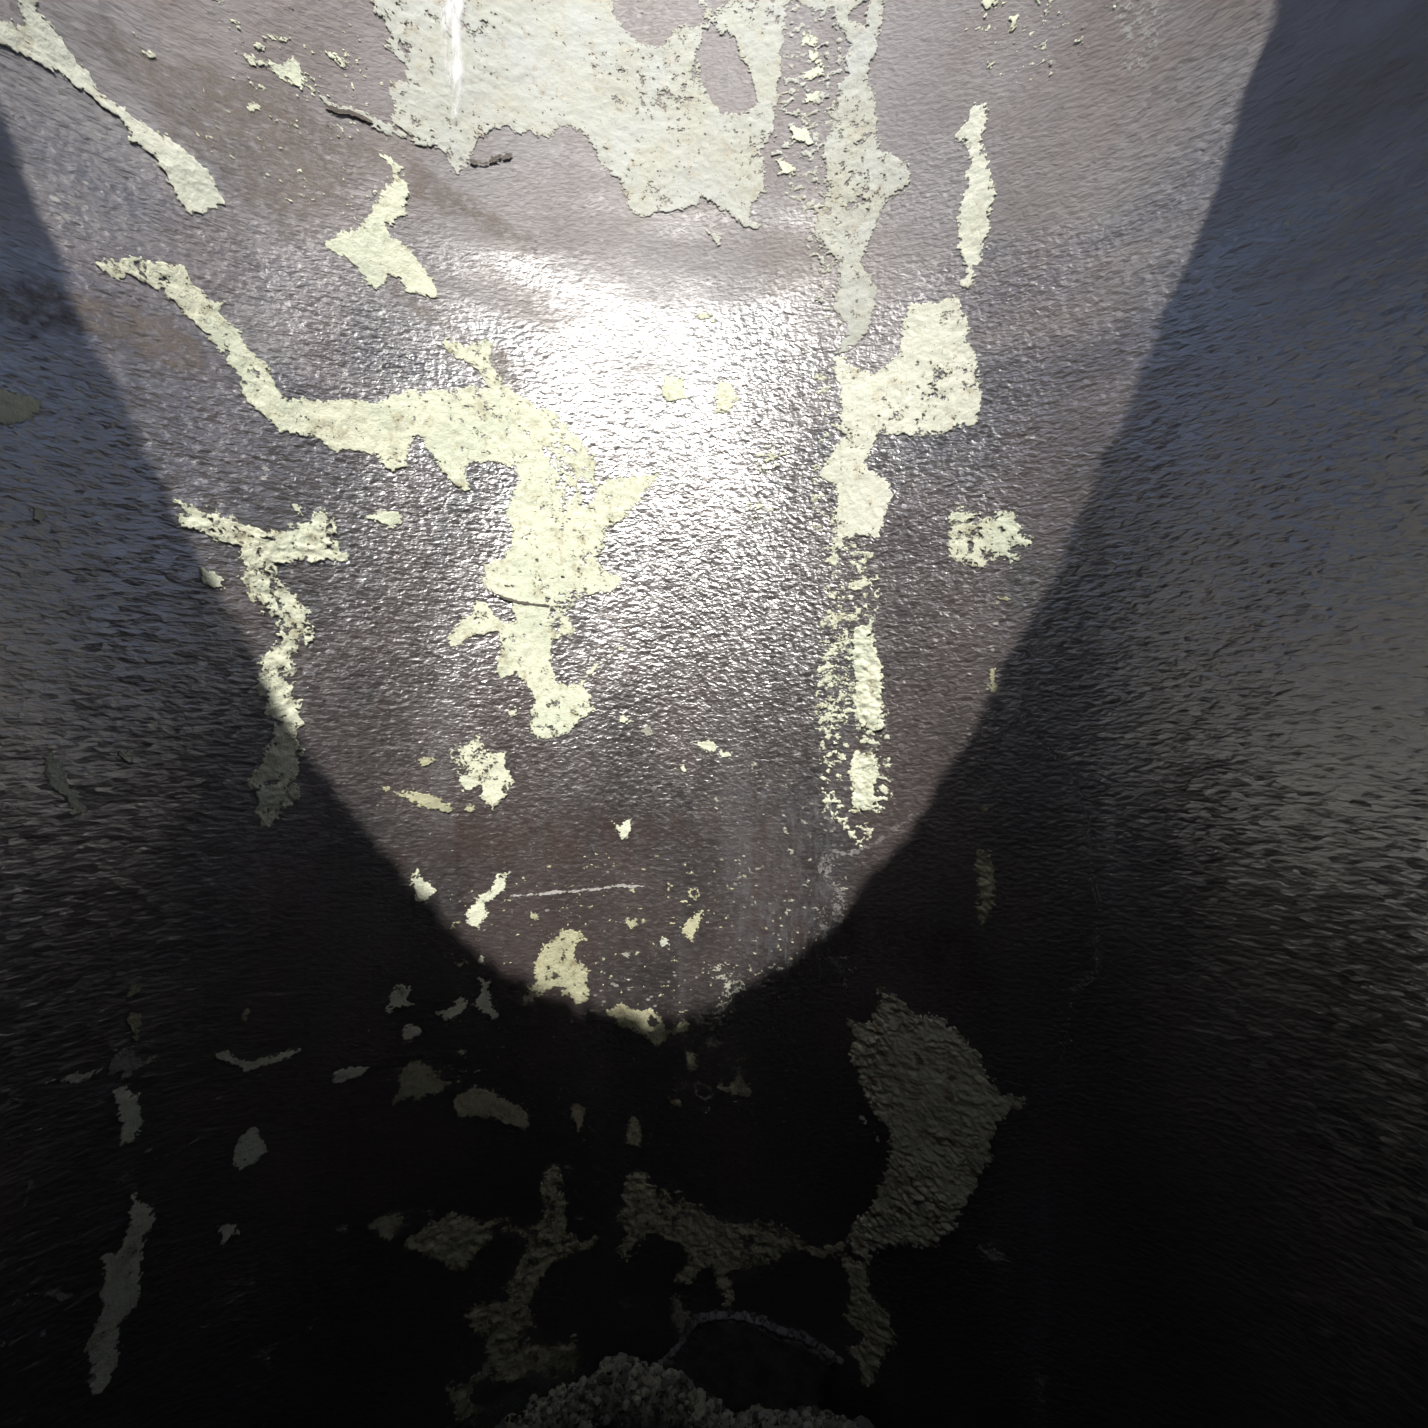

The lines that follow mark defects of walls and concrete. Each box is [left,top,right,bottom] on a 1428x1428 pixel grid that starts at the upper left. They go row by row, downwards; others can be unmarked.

peeling [965,0,1087,83]
peeling [0,0,997,1148]
peeling [948,504,1034,569]
peeling [987,668,1002,692]
peeling [231,1126,269,1171]
spalling [613,985,1028,1388]
peeling [214,1220,240,1248]
peeling [82,1192,157,1399]
peeling [367,1164,599,1421]